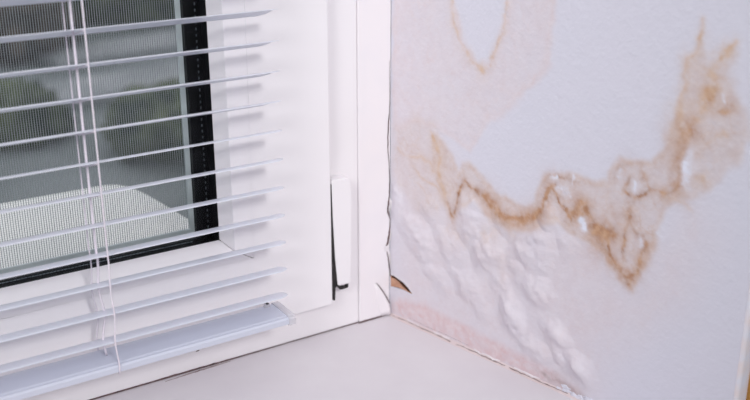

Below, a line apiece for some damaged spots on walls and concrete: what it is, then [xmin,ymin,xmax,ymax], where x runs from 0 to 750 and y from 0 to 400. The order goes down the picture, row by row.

spalling [391,274,413,294]
water stain [390,0,750,400]